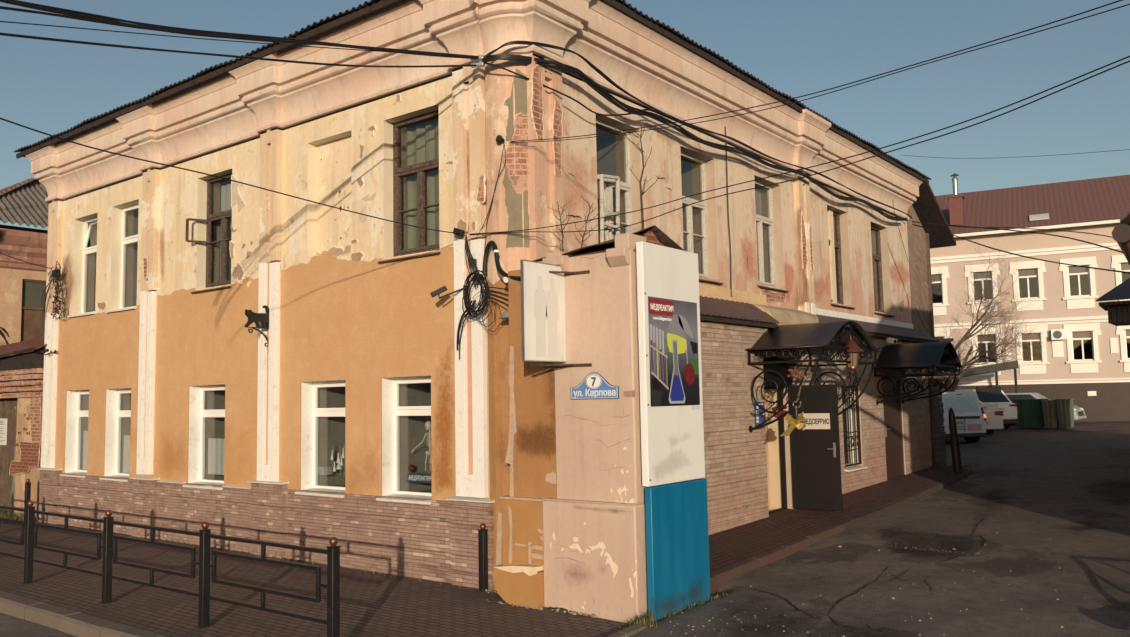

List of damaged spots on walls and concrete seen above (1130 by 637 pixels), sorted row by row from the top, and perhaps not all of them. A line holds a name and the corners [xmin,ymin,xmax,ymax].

flaking render [502,64,563,248]
flaking render [229,175,259,287]
flaking render [304,236,365,264]
peeling [334,176,376,230]
flaking render [476,173,486,204]
peeling [515,533,637,597]